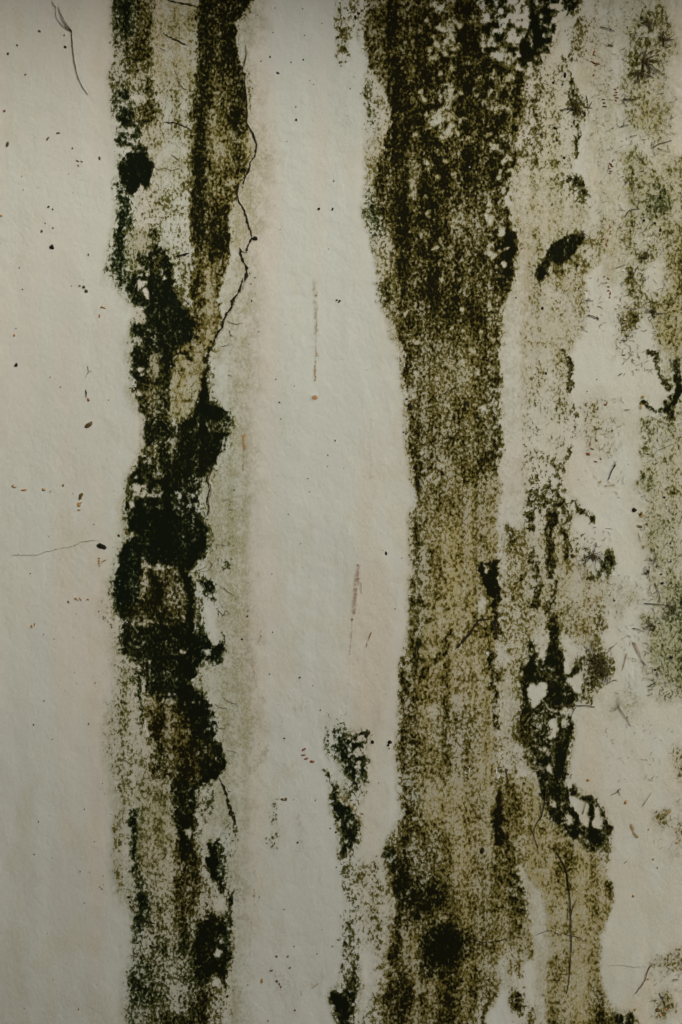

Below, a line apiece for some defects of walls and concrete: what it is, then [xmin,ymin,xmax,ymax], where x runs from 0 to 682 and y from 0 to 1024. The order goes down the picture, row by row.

water stain [96,0,258,1024]
crack [211,50,257,350]
water stain [315,0,640,1024]